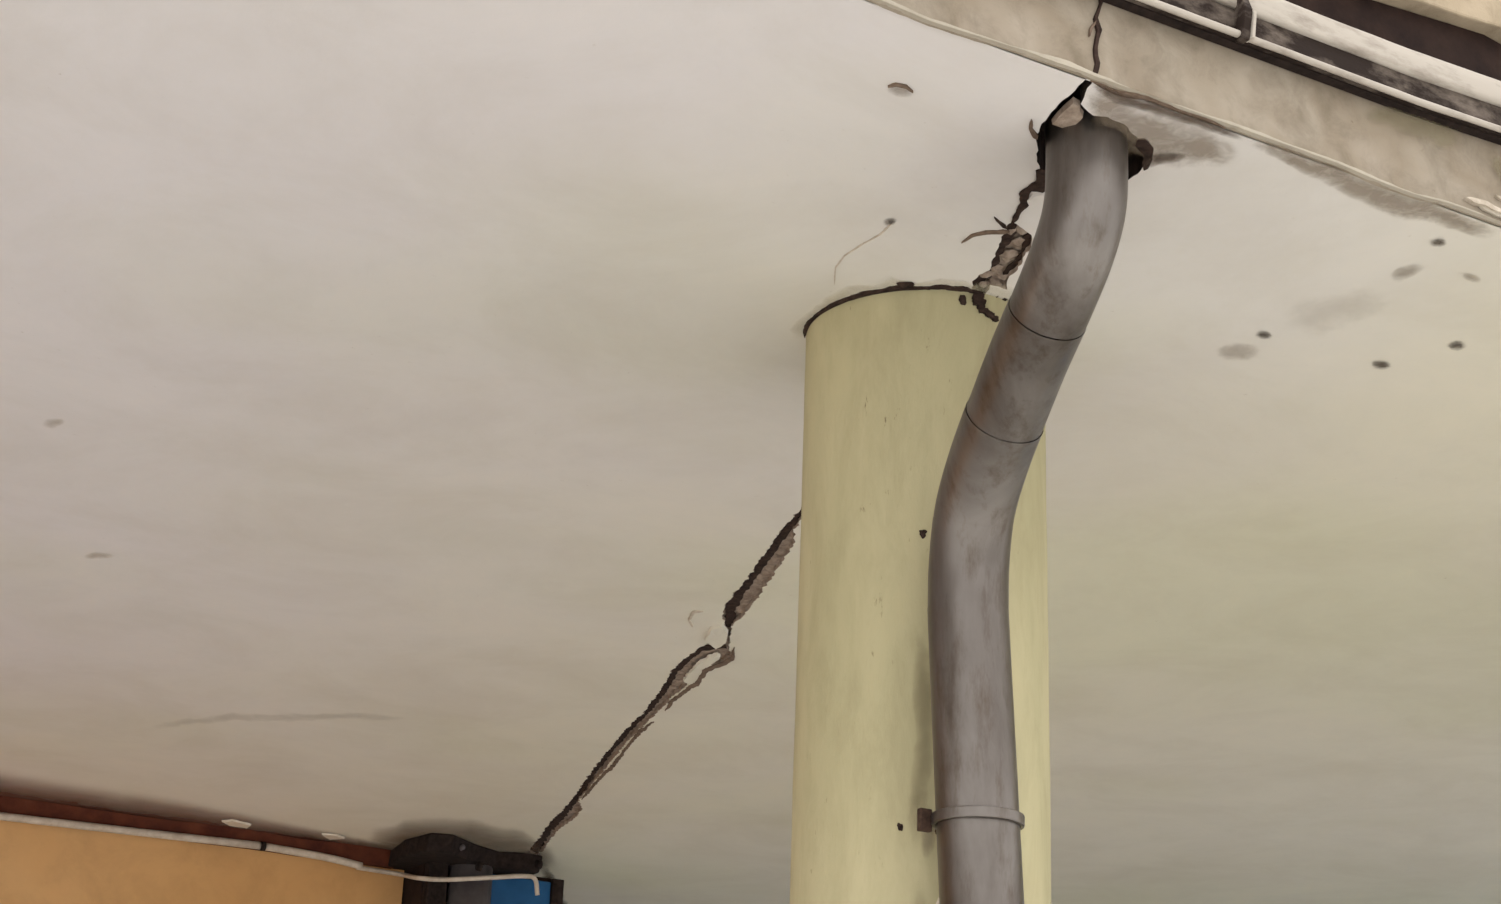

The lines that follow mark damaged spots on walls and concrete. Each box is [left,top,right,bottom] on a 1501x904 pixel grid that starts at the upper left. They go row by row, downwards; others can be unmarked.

crack [1088,0,1103,74]
crack [1029,119,1045,189]
crack [1135,139,1154,171]
leakage [1090,80,1234,166]
leakage [1271,148,1472,229]
crack [531,510,801,855]